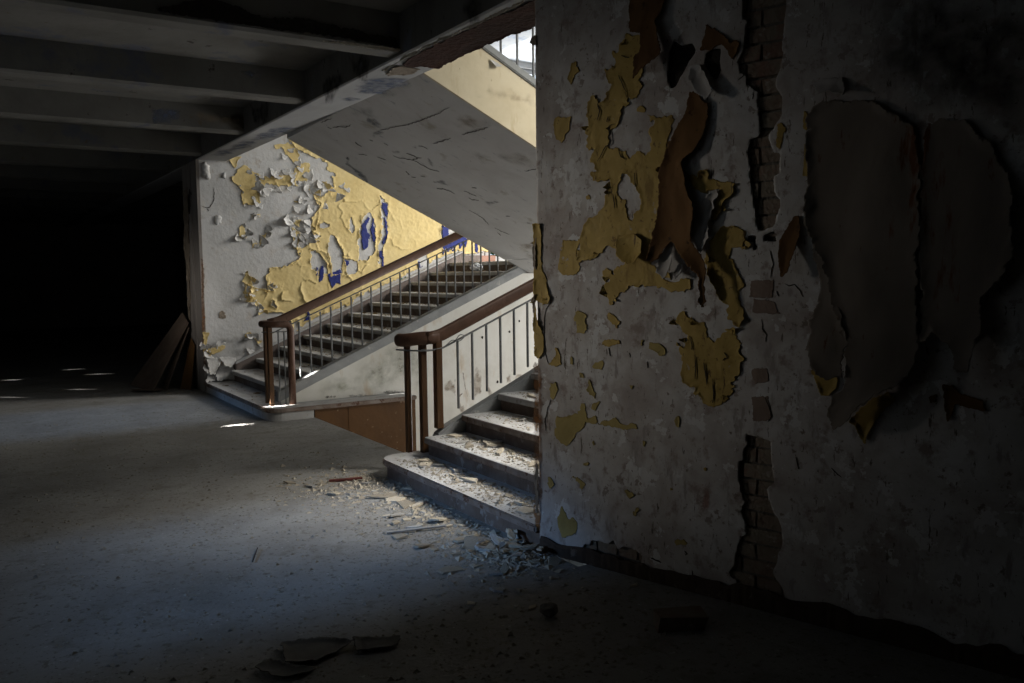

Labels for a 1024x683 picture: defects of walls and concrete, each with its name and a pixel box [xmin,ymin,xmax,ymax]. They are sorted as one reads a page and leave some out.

peeling [182,187,225,358]
peeling [244,332,263,354]
peeling [230,140,488,331]
peeling [576,0,1014,444]
flaking render [731,435,784,597]